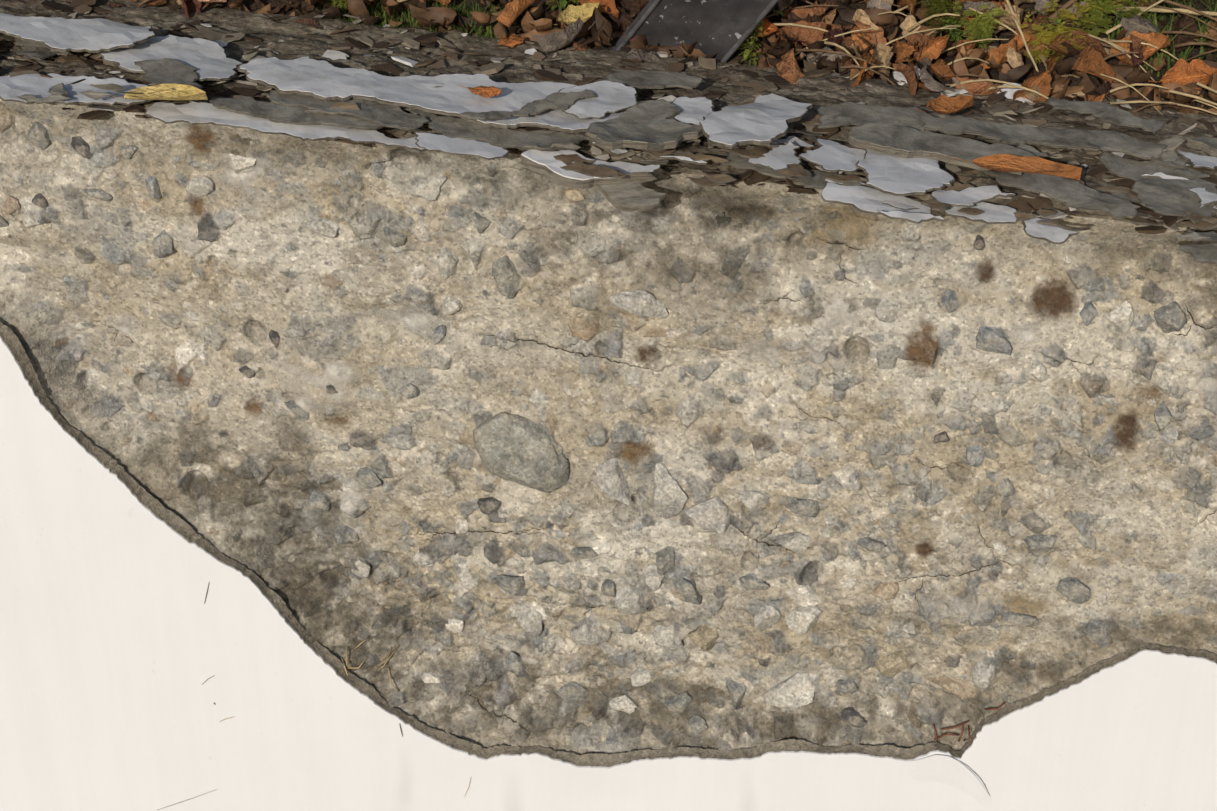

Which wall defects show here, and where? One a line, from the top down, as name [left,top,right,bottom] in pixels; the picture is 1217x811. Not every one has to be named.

peeling [0,13,703,160]
peeling [520,149,668,190]
peeling [660,93,1035,224]
peeling [792,98,1217,264]
spalling [610,290,668,319]
corrosion [1033,282,1073,317]
crack [485,335,673,372]
corrosion [908,325,938,366]
spalling [473,412,569,493]
spalling [596,458,633,505]
spalling [652,463,687,519]
spalling [763,671,816,711]